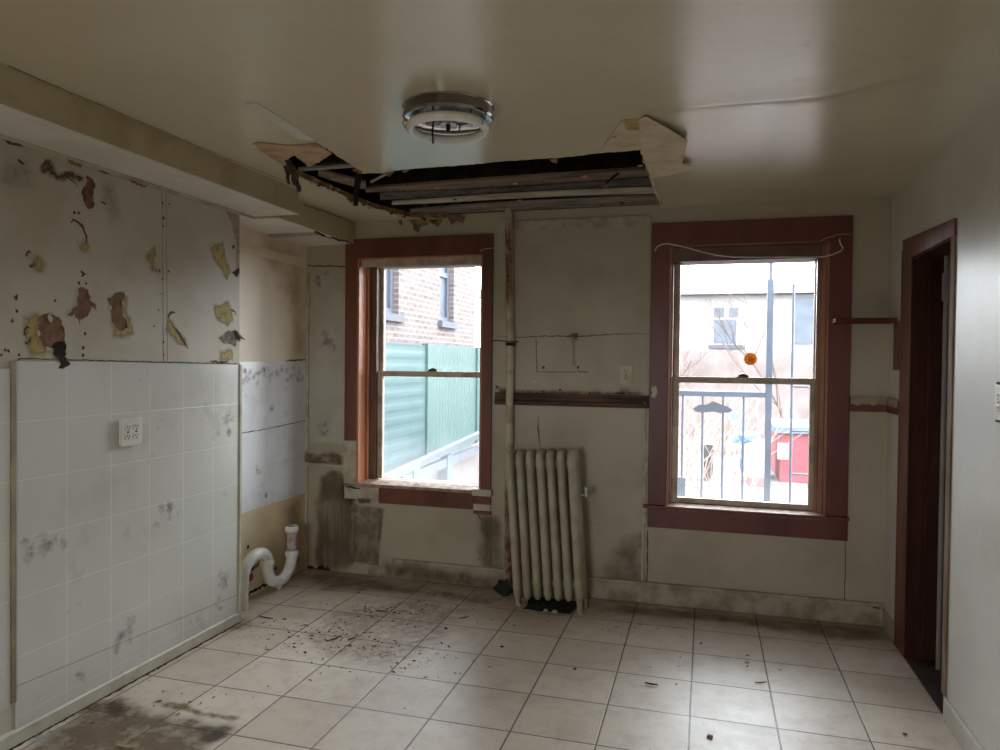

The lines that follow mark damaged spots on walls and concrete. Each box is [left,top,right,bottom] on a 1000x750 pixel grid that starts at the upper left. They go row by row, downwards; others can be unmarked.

peeling [226,211,240,277]
peeling [219,329,245,347]
leakage [306,453,382,567]
leakage [32,700,229,750]